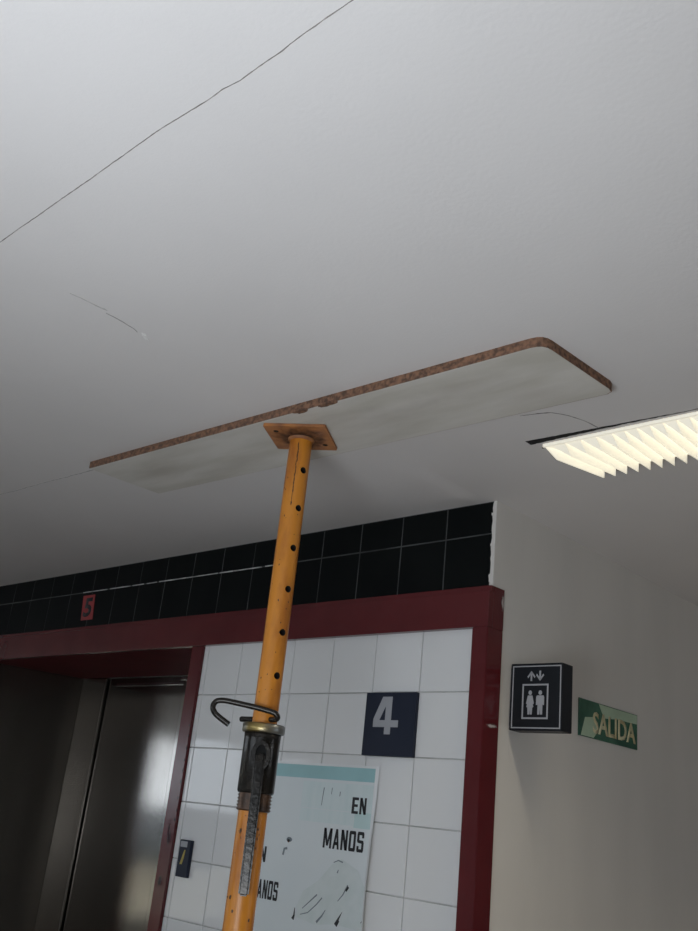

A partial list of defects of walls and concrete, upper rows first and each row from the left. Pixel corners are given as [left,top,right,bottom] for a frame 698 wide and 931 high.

crack [1,0,353,242]